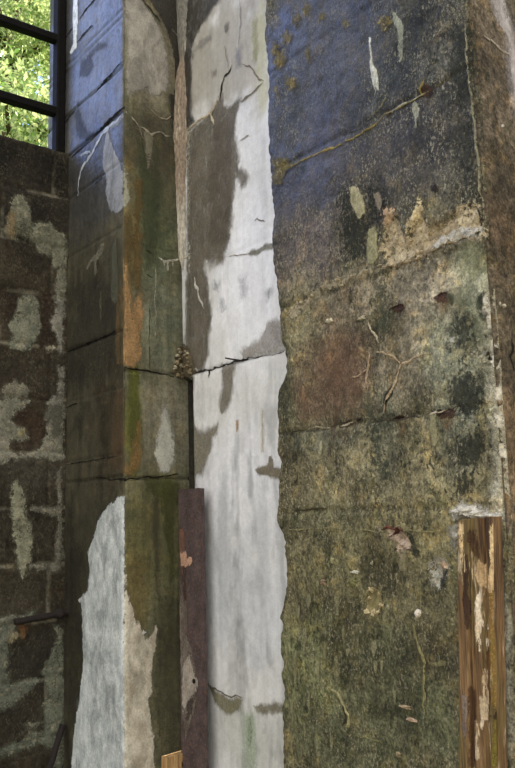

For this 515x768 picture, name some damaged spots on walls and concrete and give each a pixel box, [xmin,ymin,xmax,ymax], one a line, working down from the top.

crack [72,104,171,193]
crack [187,17,262,131]
crack [288,77,451,166]
spalling [287,14,489,322]
rust [115,178,143,368]
crack [196,351,284,377]
crack [351,322,461,446]
spalling [482,288,511,499]
peeling [0,496,158,768]